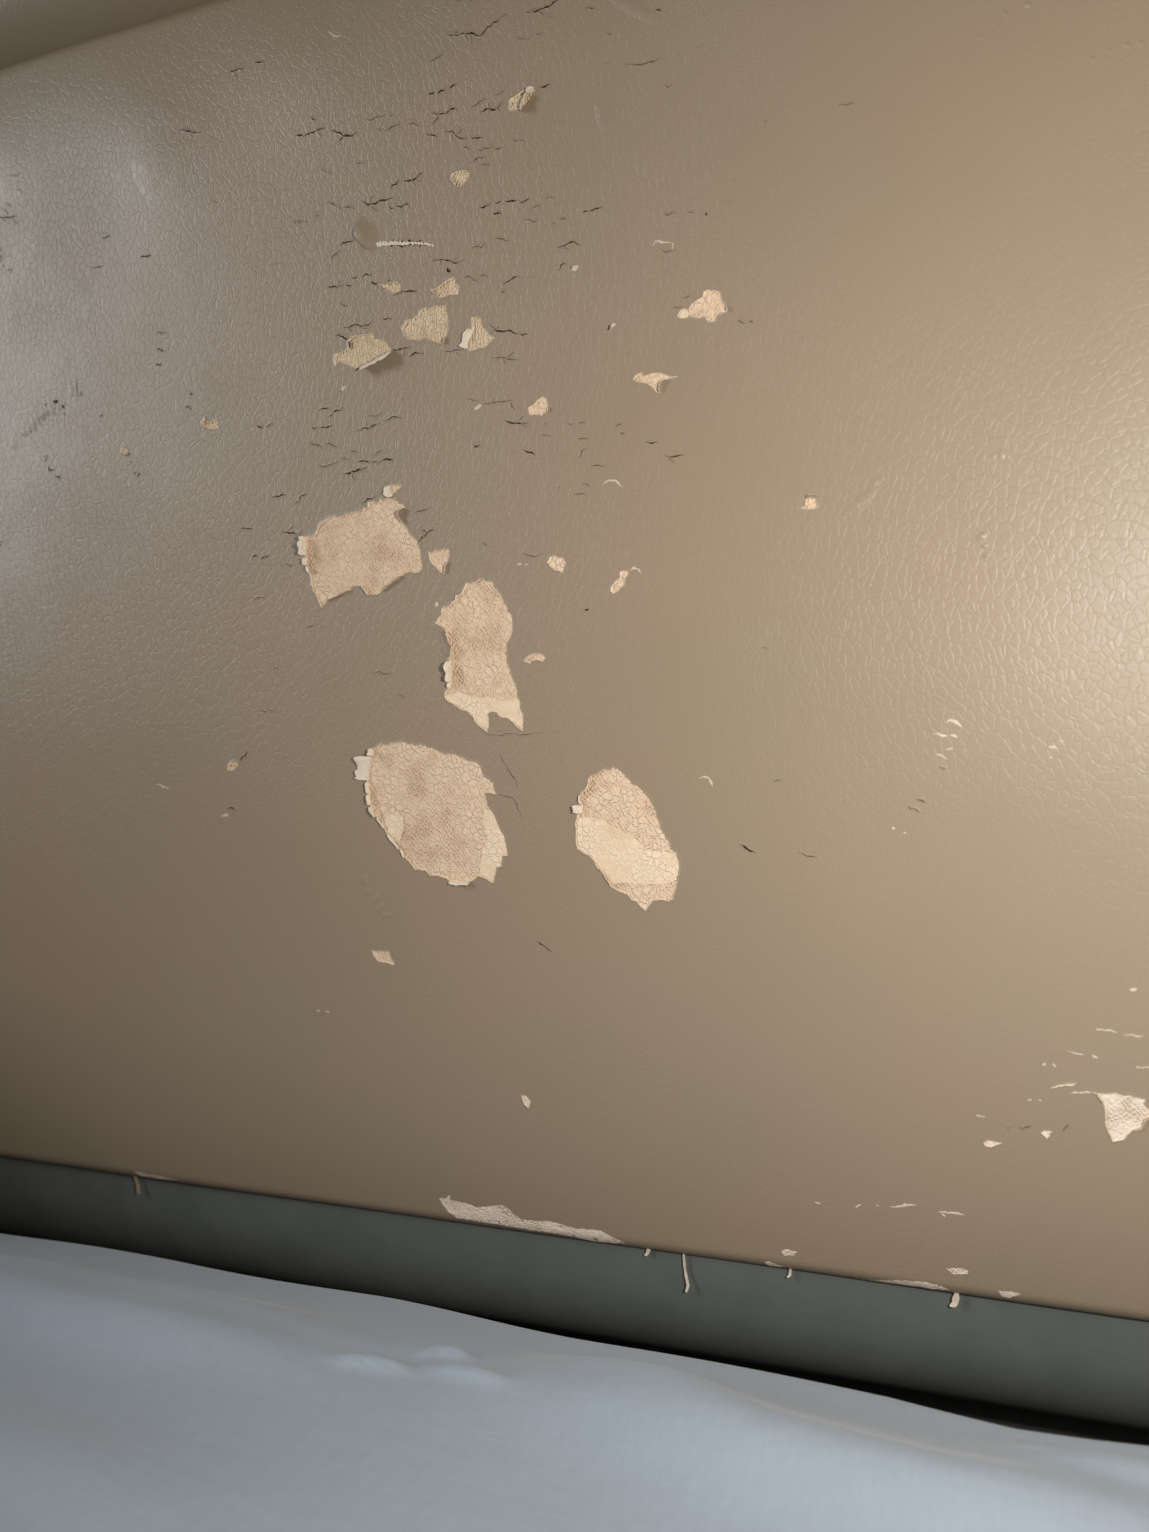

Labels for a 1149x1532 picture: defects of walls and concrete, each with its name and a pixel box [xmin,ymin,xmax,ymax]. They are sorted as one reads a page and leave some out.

crack [228,60,264,79]
peeling [332,275,497,391]
crack [291,0,684,497]
peeling [676,288,729,324]
crack [241,388,404,601]
peeling [297,483,451,610]
crack [415,506,435,543]
peeling [433,576,548,734]
peeling [353,739,510,886]
peeling [571,764,683,913]
peeling [1028,1063,1149,1144]
peeling [439,1195,625,1244]